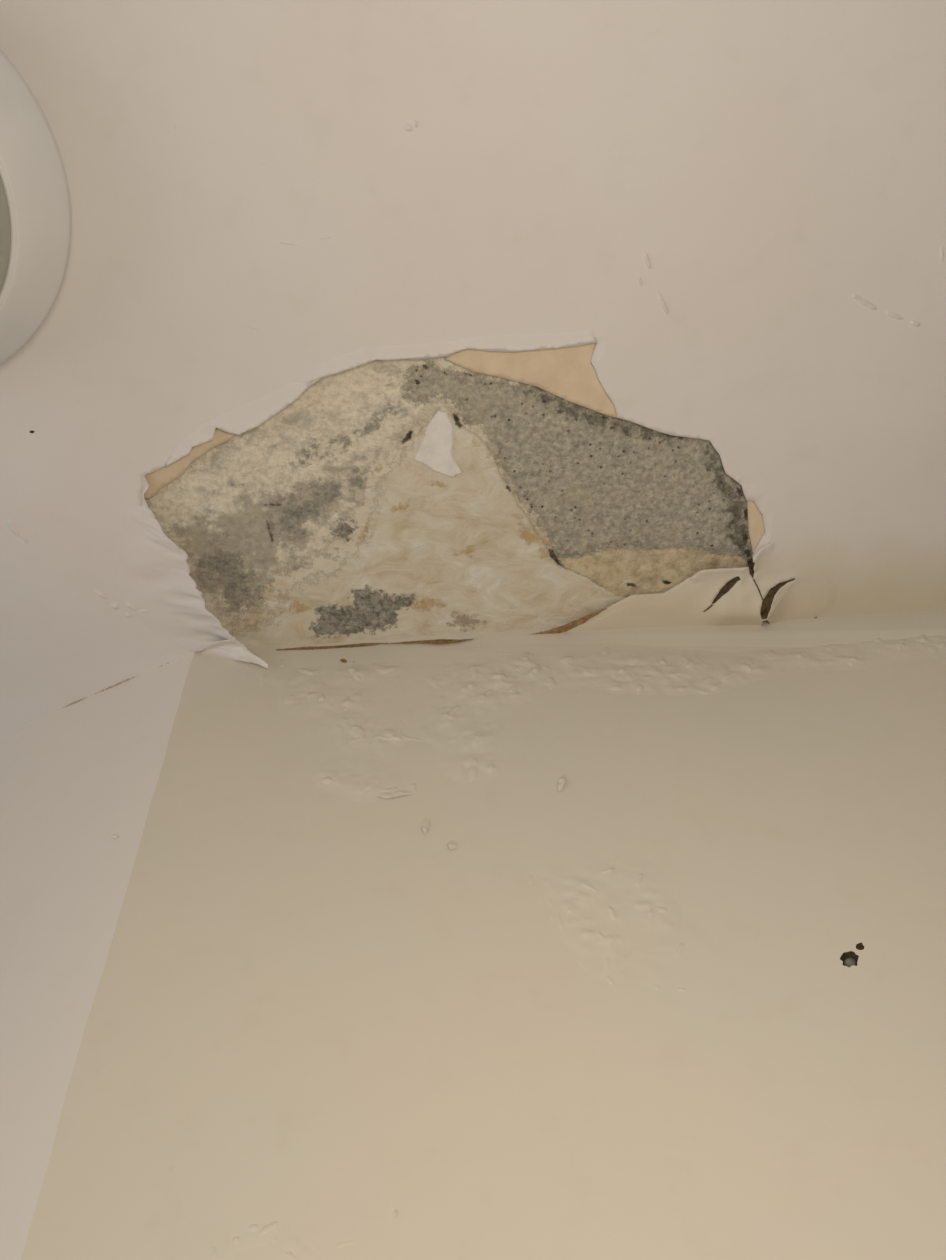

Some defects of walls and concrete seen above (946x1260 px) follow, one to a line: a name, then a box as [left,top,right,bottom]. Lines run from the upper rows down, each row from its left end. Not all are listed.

peeling [144,329,765,646]